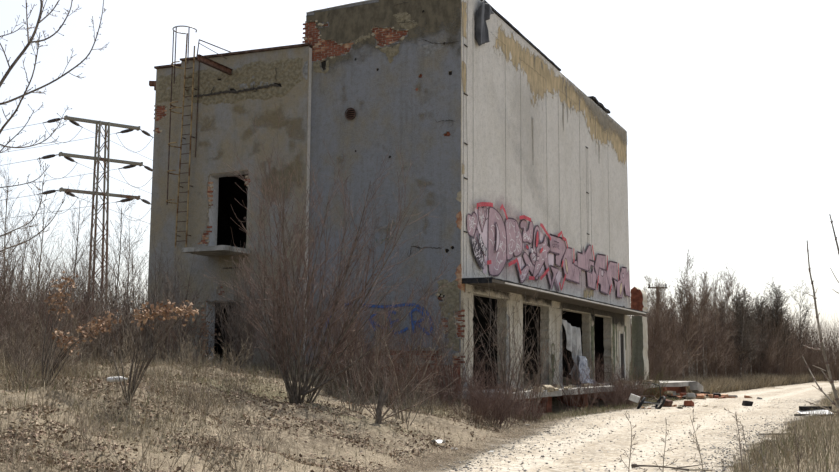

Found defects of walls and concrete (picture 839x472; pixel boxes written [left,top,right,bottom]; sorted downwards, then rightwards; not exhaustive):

spalling [153,12,418,135]
peeling [493,24,627,168]
flaking render [435,264,465,368]